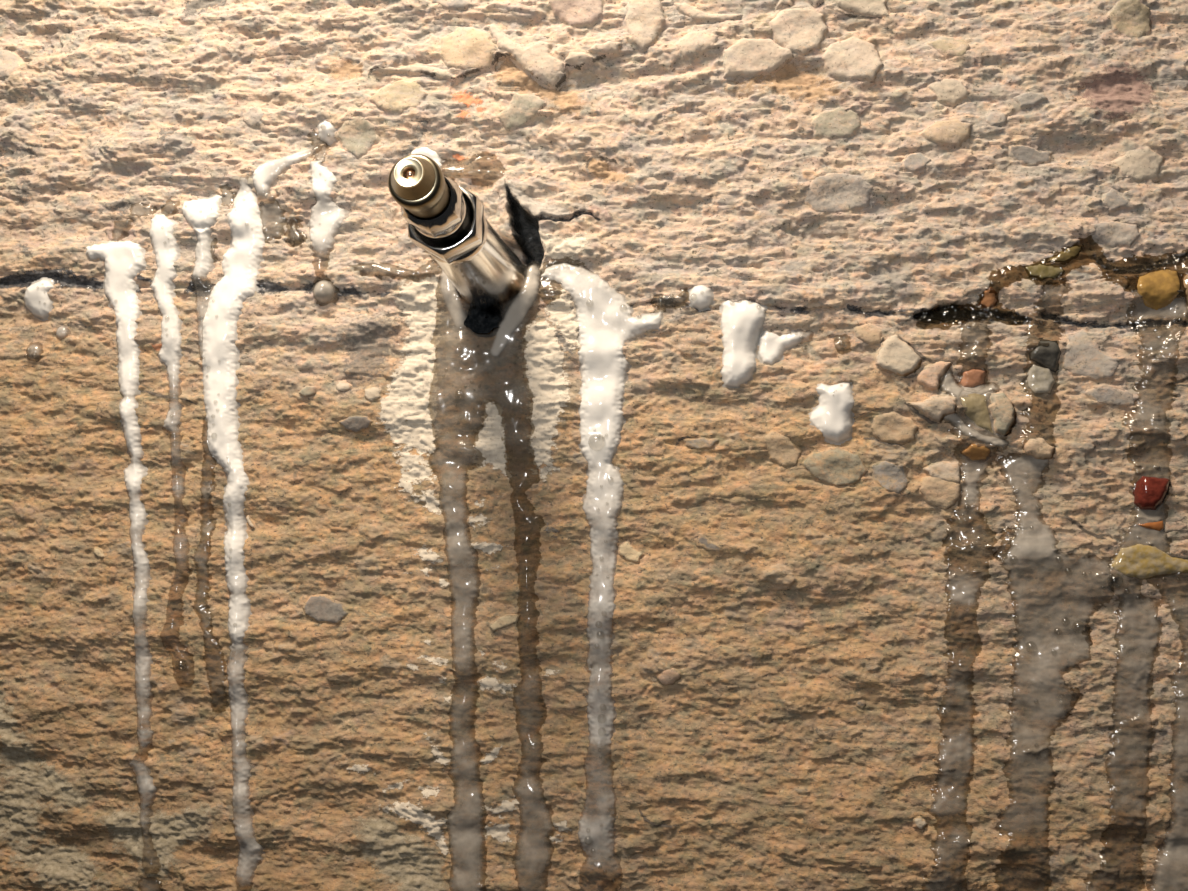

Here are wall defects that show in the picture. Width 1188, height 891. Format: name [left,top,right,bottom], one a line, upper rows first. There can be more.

crack [0,268,105,292]
crack [184,274,215,298]
crack [256,280,403,316]
leakage [539,226,589,264]
crack [630,296,711,312]
crack [990,311,1188,332]
leakage [375,275,445,515]
leakage [519,286,581,482]
crack [747,299,956,446]
leakage [471,399,512,480]
leakage [0,690,111,891]
leakage [353,779,450,891]